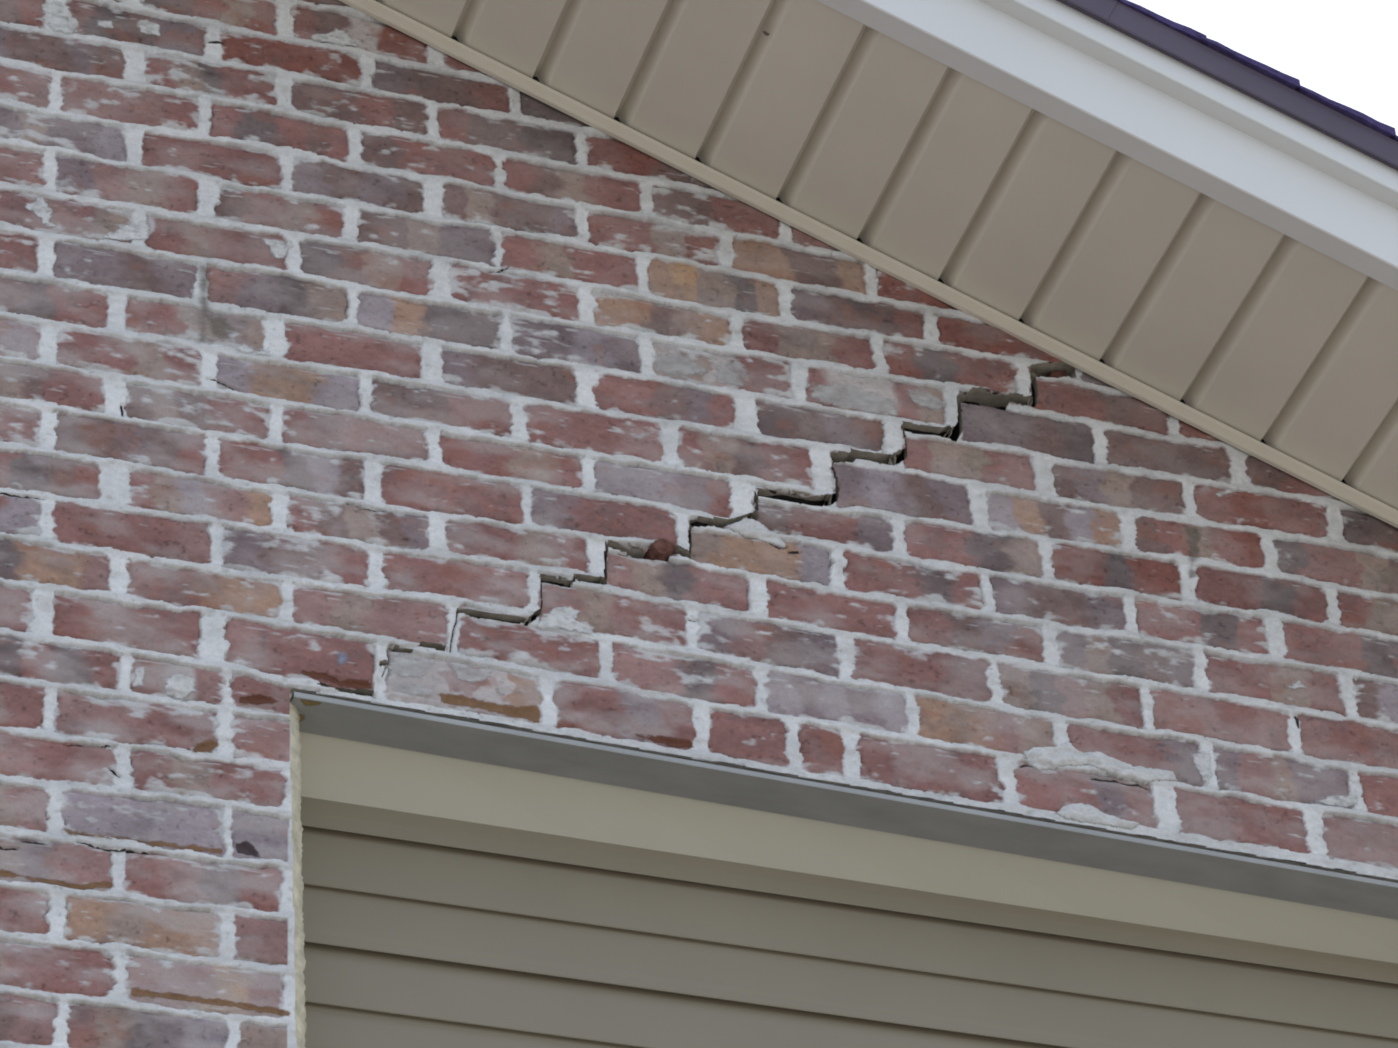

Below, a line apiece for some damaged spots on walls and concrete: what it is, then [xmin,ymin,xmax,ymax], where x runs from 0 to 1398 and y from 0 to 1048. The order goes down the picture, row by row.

crack [317,361,1076,698]
crack [1091,778,1149,791]